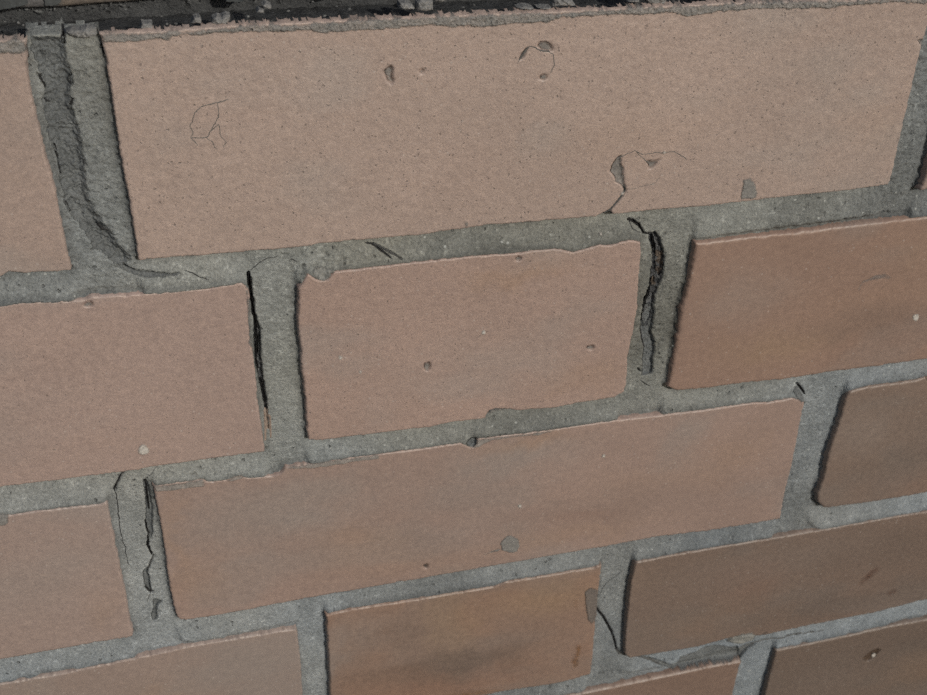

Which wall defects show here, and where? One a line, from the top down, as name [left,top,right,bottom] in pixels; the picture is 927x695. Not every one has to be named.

spalling [601,150,687,214]
crack [247,256,296,441]
crack [627,217,664,387]
crack [113,467,161,620]
crack [596,571,660,664]